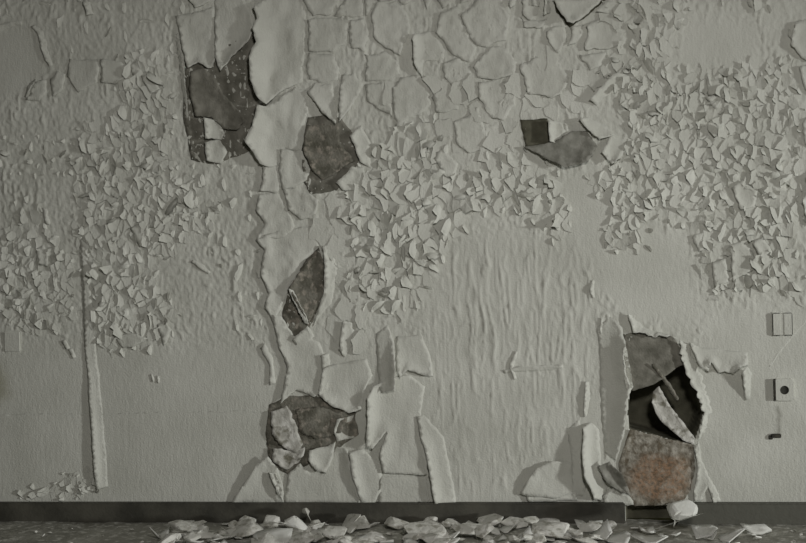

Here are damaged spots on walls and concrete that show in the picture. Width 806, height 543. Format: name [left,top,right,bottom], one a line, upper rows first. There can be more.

peeling [0,47,223,502]
crack [303,0,634,180]
peeling [170,0,806,506]